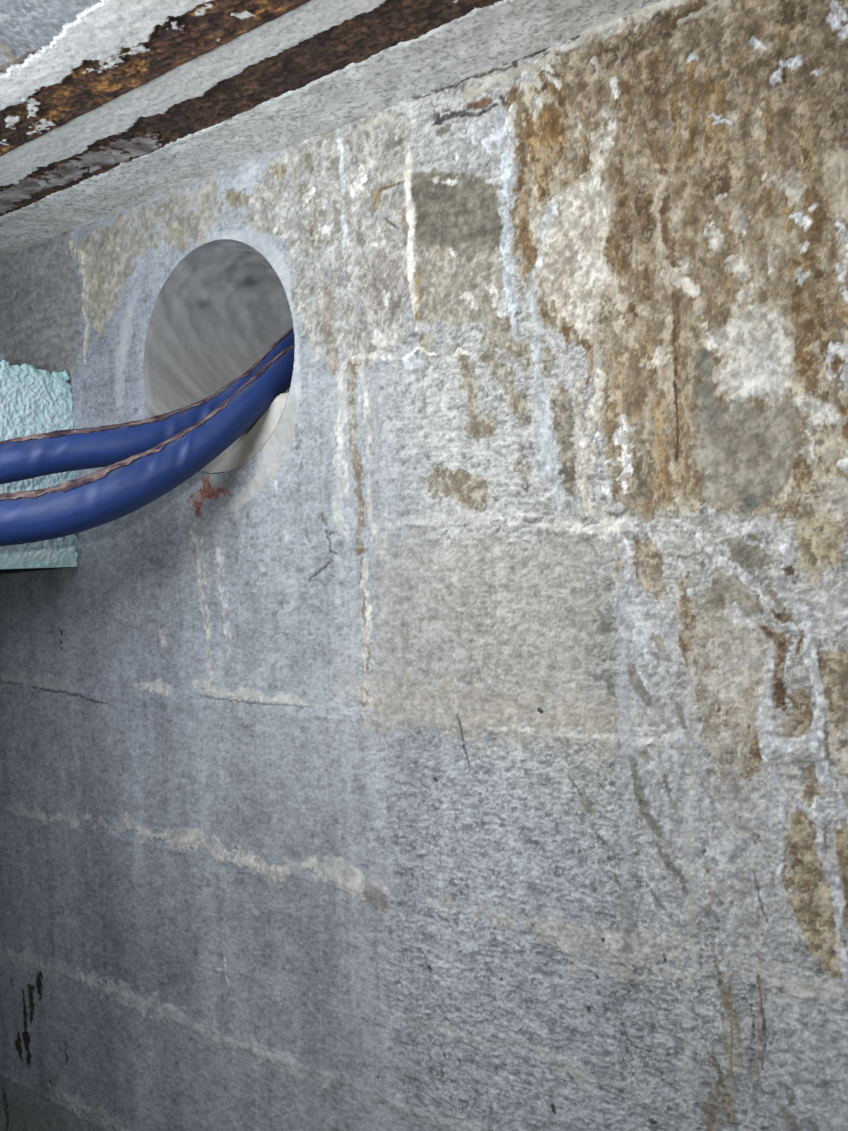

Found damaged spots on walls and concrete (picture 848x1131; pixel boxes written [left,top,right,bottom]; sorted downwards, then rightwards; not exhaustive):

corrosion [0,48,37,73]
peeling [0,0,387,214]
damp [529,62,564,124]
damp [746,34,826,88]
damp [824,0,848,41]
damp [0,75,695,599]
damp [667,254,702,300]
damp [701,190,848,472]
damp [760,160,820,287]
damp [187,519,233,684]
damp [331,449,848,984]
damp [0,969,136,1131]